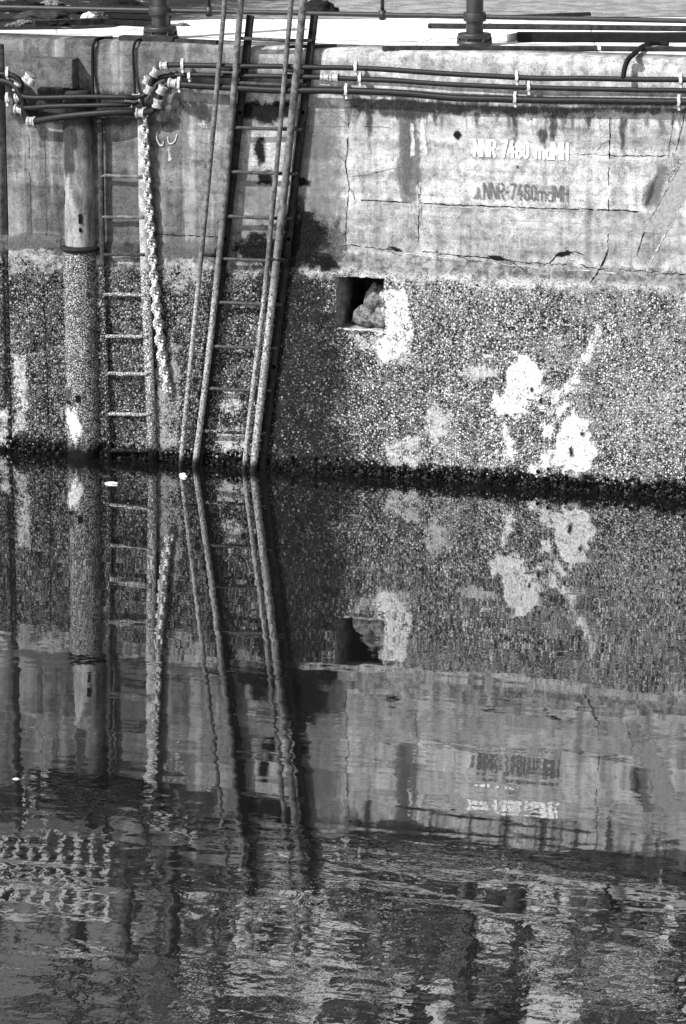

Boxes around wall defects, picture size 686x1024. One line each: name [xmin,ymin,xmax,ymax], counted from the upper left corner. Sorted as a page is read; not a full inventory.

crack [277,110,686,283]
damp [344,96,686,211]